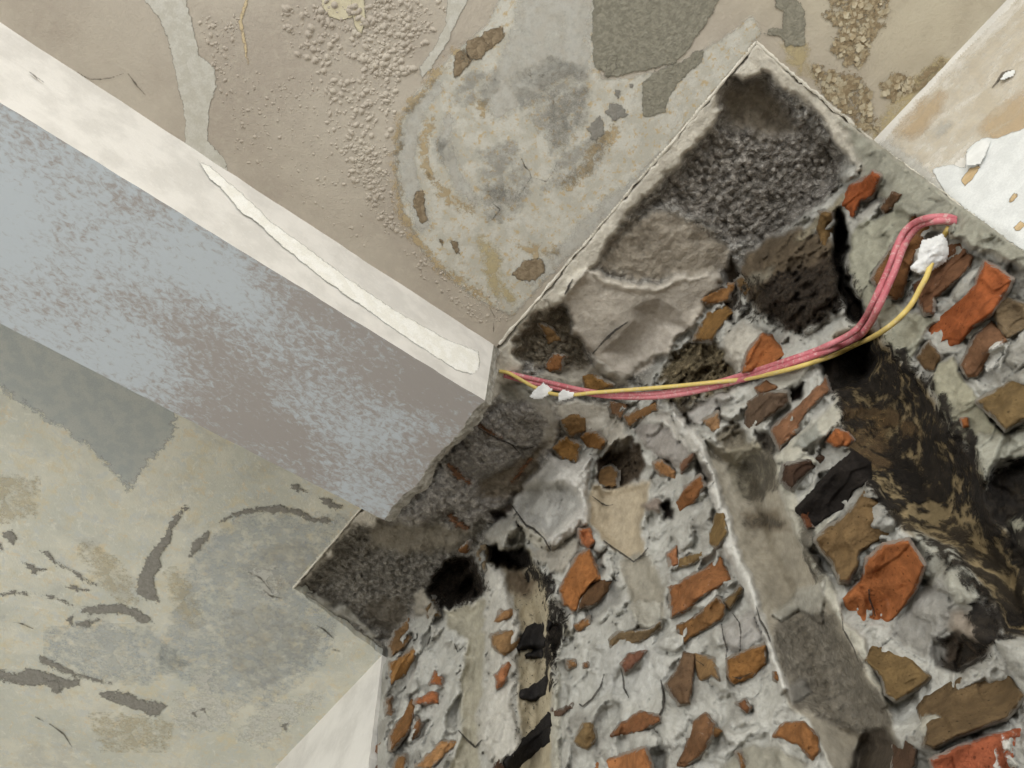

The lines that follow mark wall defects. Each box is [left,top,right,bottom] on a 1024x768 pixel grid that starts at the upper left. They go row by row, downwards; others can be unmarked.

peeling [145,0,480,374]
water stain [390,0,761,316]
spalling [292,0,1024,768]
spalling [0,529,17,550]
spalling [22,505,189,628]
spalling [188,530,210,557]
spalling [219,497,343,524]
water stain [828,246,1024,674]
spalling [0,656,168,717]